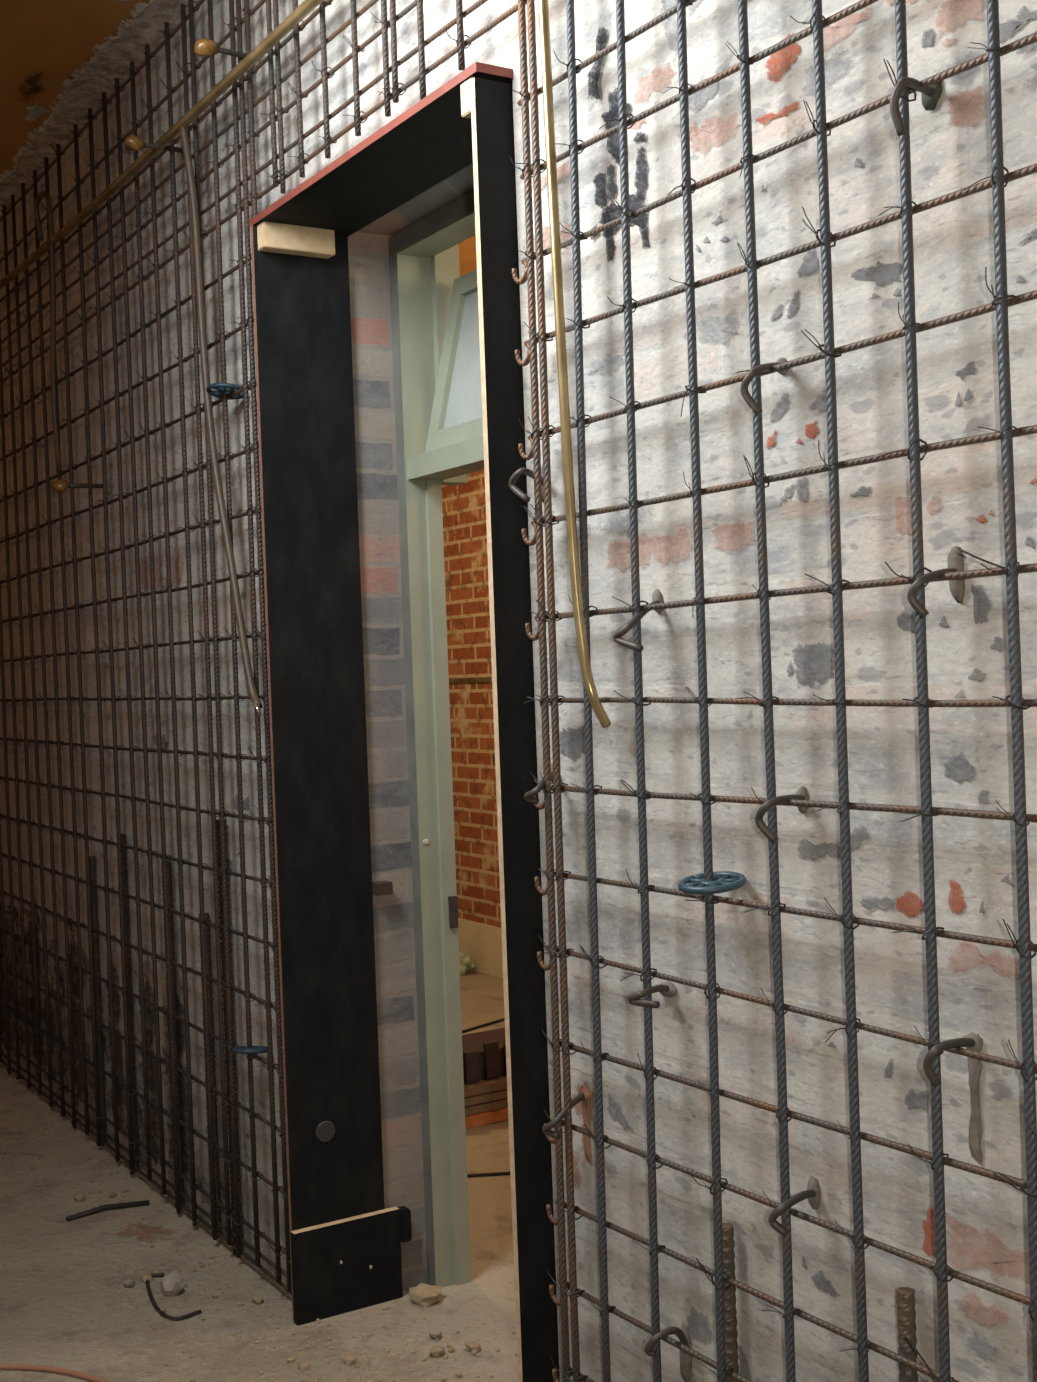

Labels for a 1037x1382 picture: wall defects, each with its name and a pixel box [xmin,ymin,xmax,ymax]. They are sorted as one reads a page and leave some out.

spalling [883,0,915,87]
flaking render [922,29,936,48]
flaking render [999,5,1037,44]
peeling [948,86,983,127]
spalling [0,0,279,276]
leakage [587,27,650,262]
spalling [916,582,929,607]
spalling [633,619,642,645]
spalling [767,805,778,837]
flaking render [922,1206,936,1257]
spalling [652,1340,662,1382]